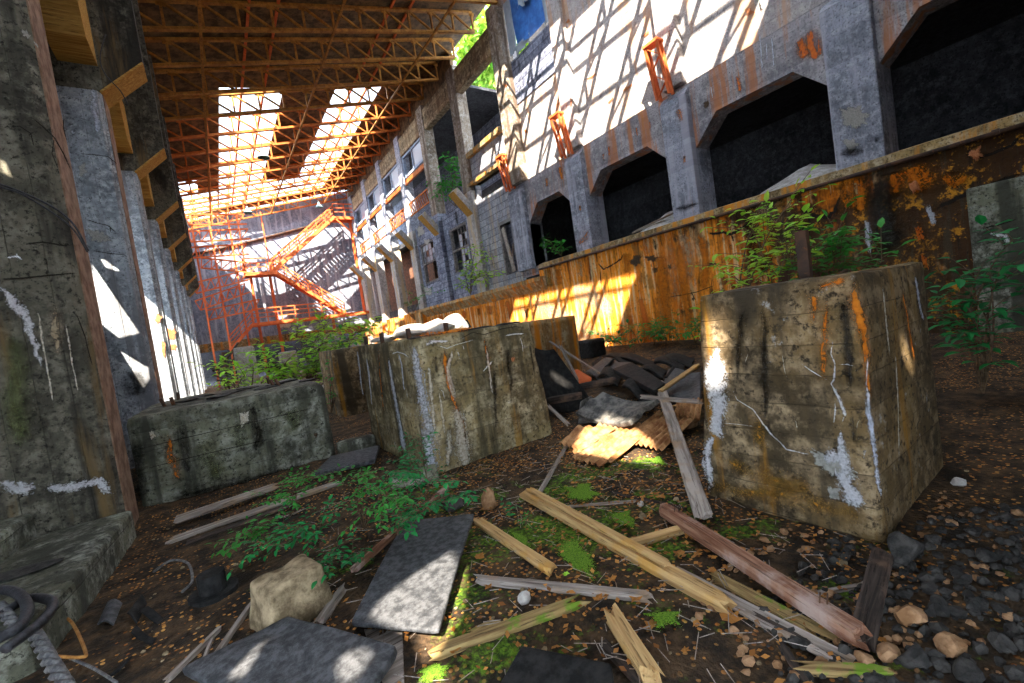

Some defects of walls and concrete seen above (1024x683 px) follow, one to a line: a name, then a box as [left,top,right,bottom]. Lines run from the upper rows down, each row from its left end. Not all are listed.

rust [797,31,821,59]
rust [841,178,867,211]
rust [889,165,967,194]
rust [617,236,710,343]
water stain [702,314,743,490]
water stain [761,316,769,416]
rust [811,278,870,394]
water stain [824,303,880,507]